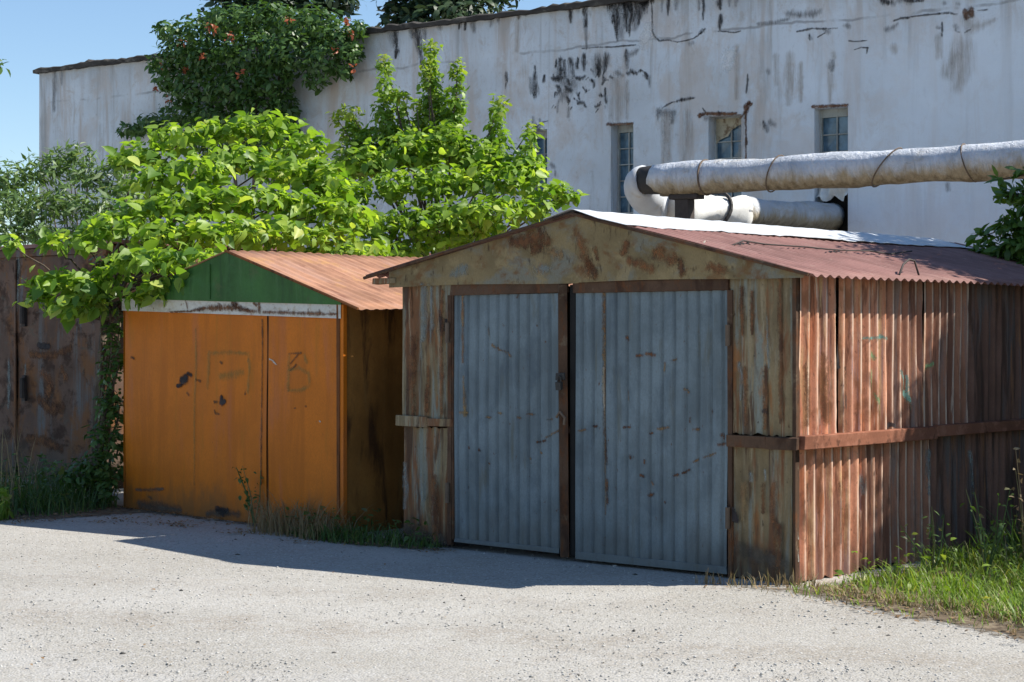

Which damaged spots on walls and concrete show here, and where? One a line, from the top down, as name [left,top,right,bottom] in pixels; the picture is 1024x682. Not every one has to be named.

rust [409,290,447,416]
rust [579,293,608,514]
rust [802,353,830,426]